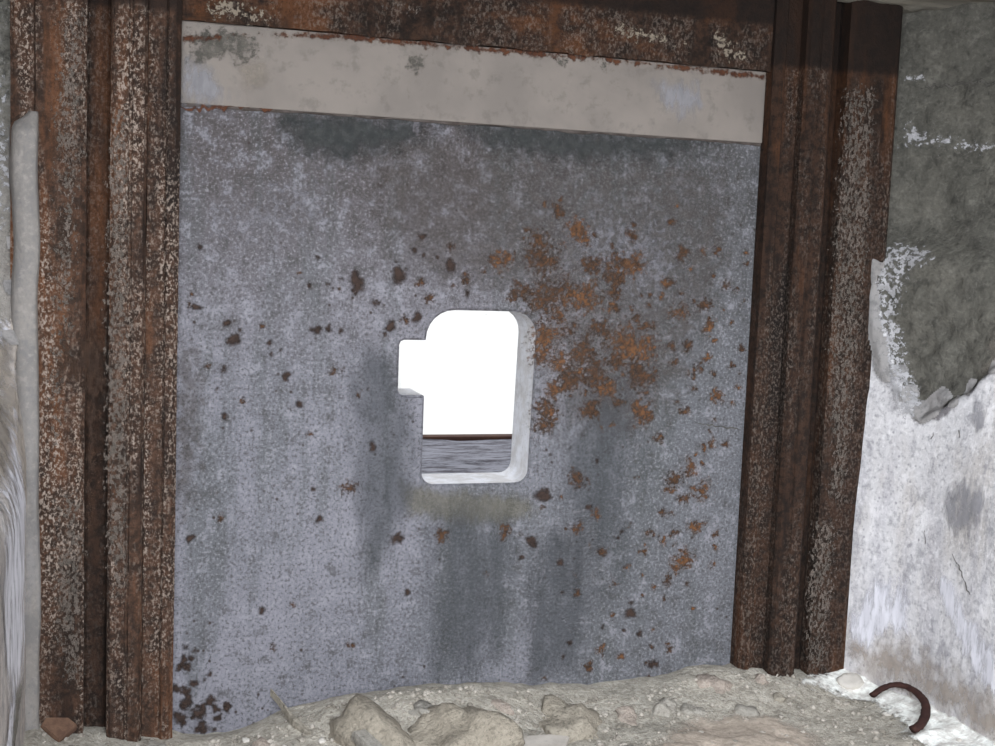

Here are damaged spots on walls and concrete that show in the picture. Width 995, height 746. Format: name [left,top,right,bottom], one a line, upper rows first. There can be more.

rust [281,30,767,80]
spalling [0,0,19,434]
rust [223,319,241,345]
rust [326,270,364,295]
rust [383,266,433,337]
rust [481,196,693,445]
rust [641,278,734,404]
spalling [825,2,995,502]
rust [534,488,563,510]
rust [658,418,729,517]
rust [601,520,719,629]
peeling [805,520,838,671]